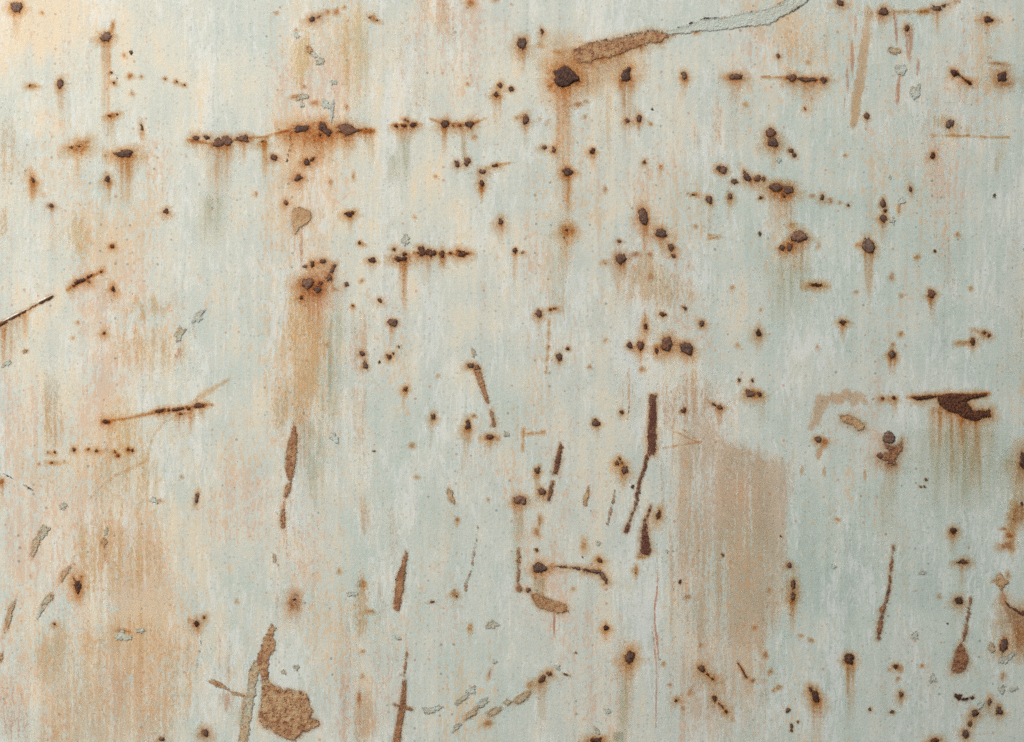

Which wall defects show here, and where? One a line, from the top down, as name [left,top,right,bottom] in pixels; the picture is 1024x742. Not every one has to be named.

peeling [573,0,808,63]
rust [553,65,579,87]
rust [192,135,248,147]
rust [294,122,366,136]
rust [716,166,793,199]
rust [300,259,336,299]
rust [913,393,990,421]
rust [532,548,547,572]
peeling [209,624,319,742]